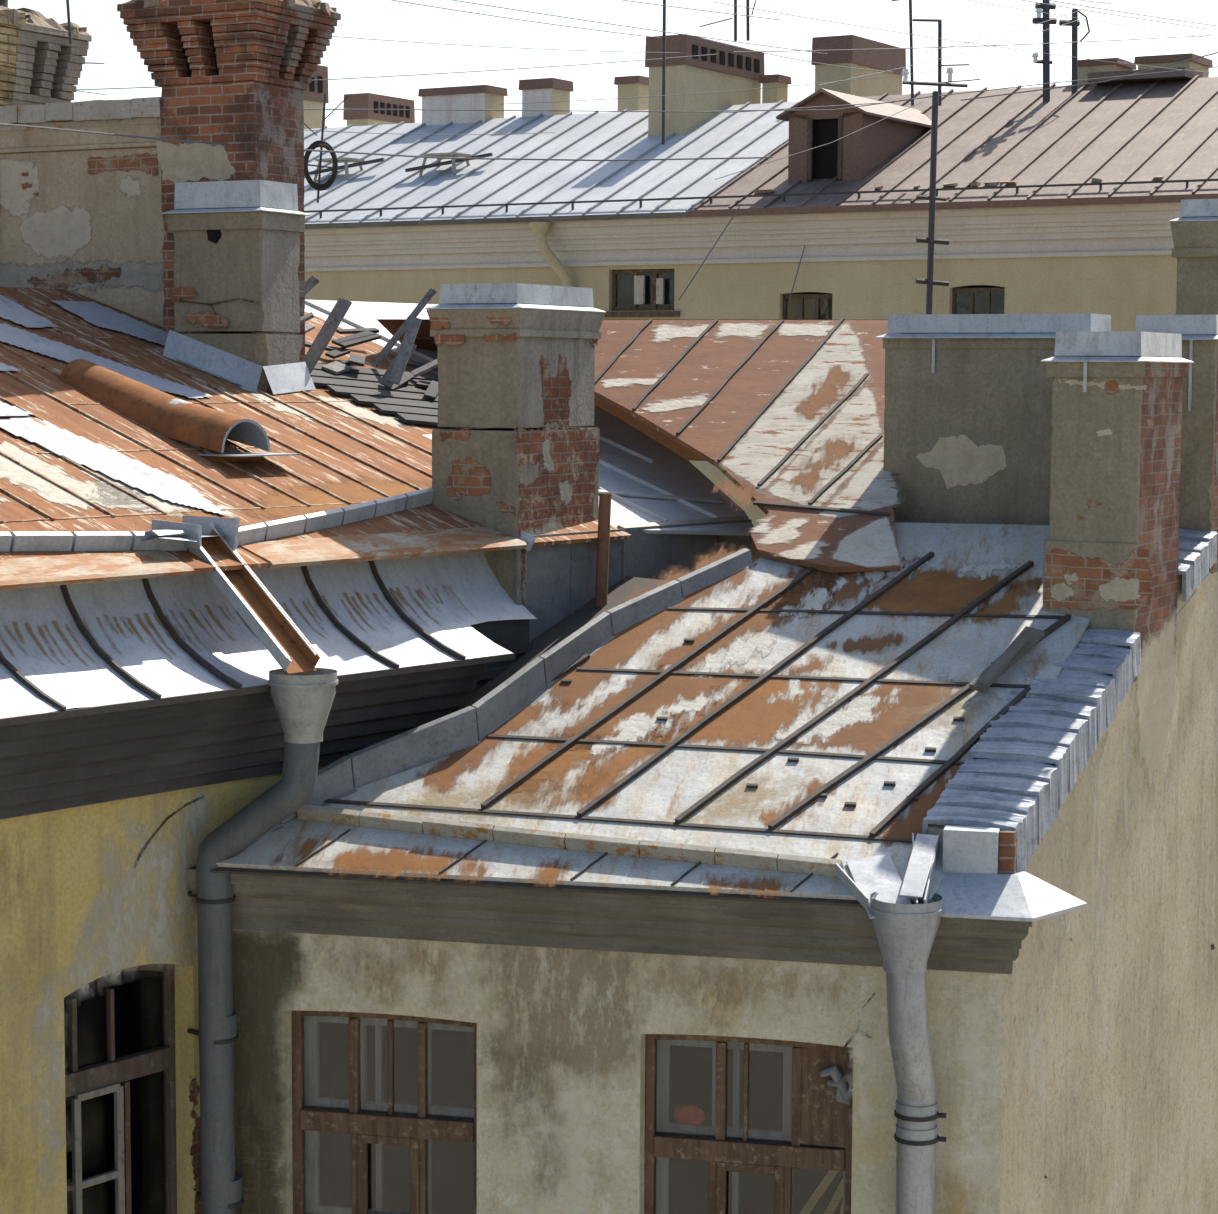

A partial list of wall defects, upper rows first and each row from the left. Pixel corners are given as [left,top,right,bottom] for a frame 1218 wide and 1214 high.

peeling [236,384,413,432]
corrosion [795,365,850,419]
corrosion [164,475,432,526]
flaking render [445,354,600,608]
corrosion [790,439,855,494]
peeling [916,434,1007,489]
peeling [587,632,777,764]
corrosion [418,546,1042,810]
peeling [767,679,901,744]
damp [69,796,208,991]
corrosion [333,847,487,879]
damp [490,947,632,1117]